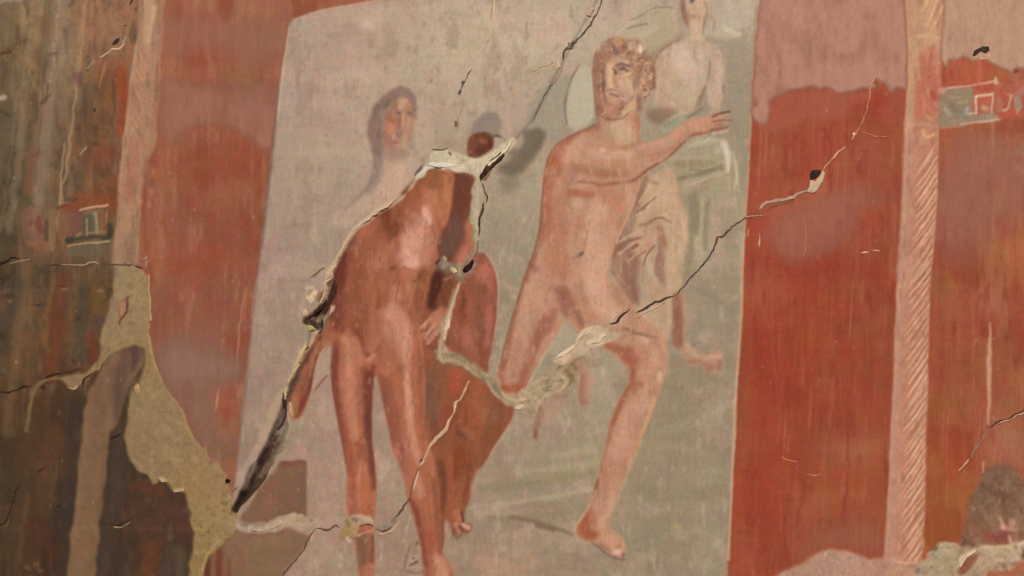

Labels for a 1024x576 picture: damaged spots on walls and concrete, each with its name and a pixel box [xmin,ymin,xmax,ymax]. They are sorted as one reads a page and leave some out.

crack [86,0,133,112]
crack [454,0,495,127]
crack [531,0,602,125]
crack [0,256,148,269]
crack [463,144,508,273]
flaking render [401,136,622,418]
crack [611,72,887,324]
crack [234,197,398,511]
flaking render [24,265,314,576]
crack [282,380,470,576]
crack [958,410,1024,473]
flaking render [778,540,1024,576]